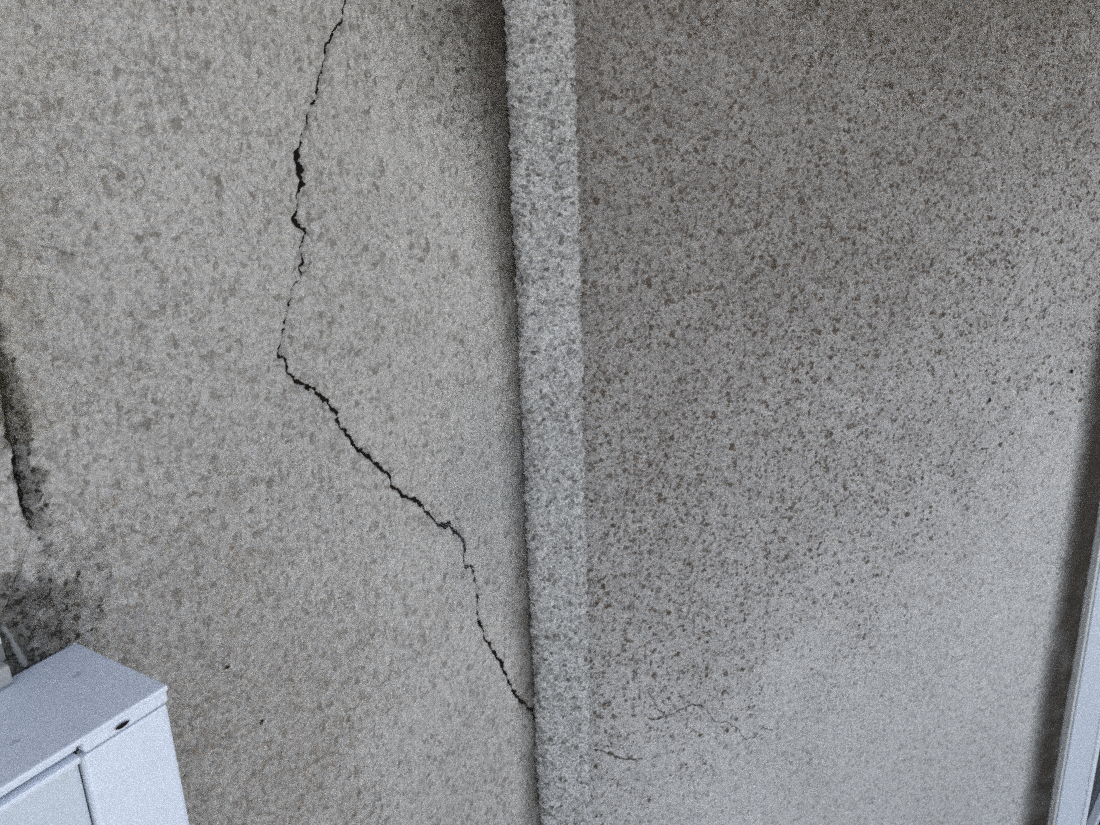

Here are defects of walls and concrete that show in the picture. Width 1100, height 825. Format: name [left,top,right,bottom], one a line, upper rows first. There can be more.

crack [0,372,30,526]
crack [277,0,534,717]